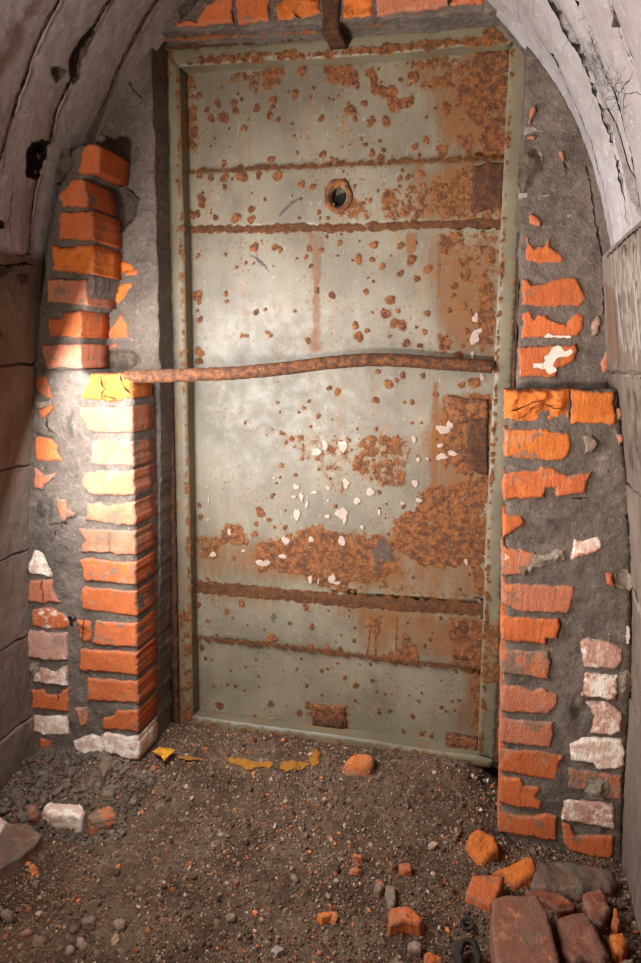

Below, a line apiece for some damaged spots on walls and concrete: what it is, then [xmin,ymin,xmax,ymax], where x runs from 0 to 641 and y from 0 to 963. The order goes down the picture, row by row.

crack [98,0,158,141]
crack [0,0,111,268]
spalling [26,139,50,180]
crack [518,0,641,316]
spalling [114,187,139,234]
spalling [109,348,142,371]
crack [100,375,131,400]
rust [124,27,514,752]
crack [511,390,571,423]